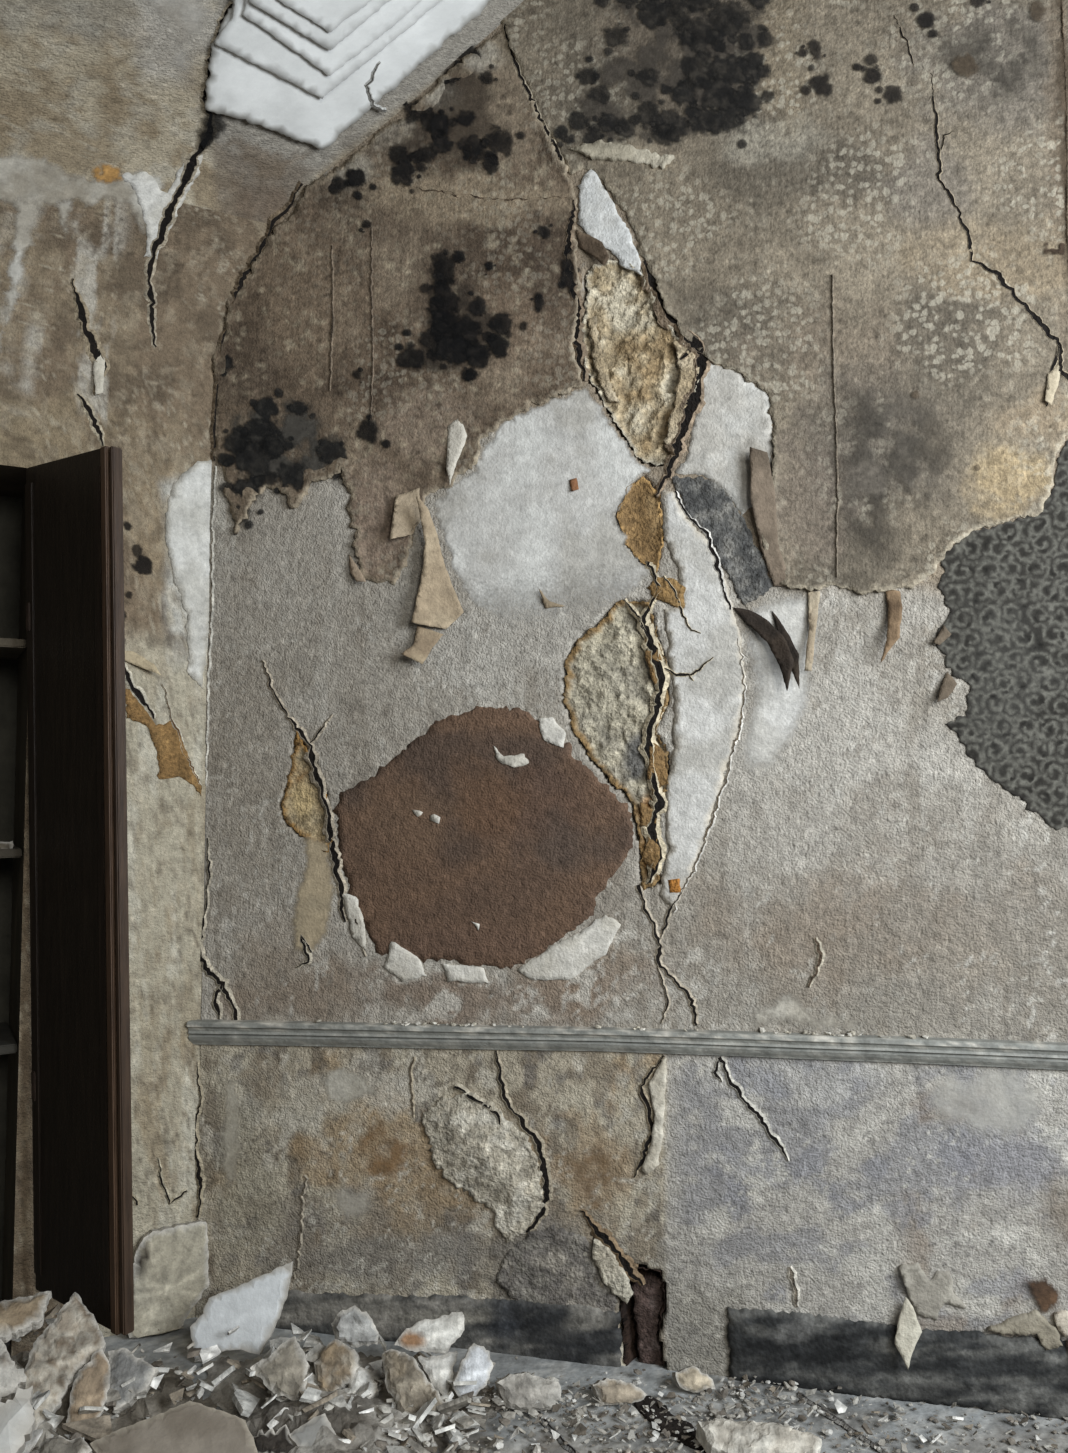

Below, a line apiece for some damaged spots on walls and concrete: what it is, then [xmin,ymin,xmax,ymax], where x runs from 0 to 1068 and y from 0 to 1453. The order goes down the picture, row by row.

mould [551,0,774,148]
crack [143,1,233,348]
mould [395,249,544,384]
mould [558,248,580,292]
crack [893,0,1068,406]
mould [218,388,390,529]
flaking render [281,139,816,983]
peeling [125,651,162,676]
crack [623,260,747,1178]
crack [454,1050,646,1286]
spalling [496,1224,666,1366]
spalling [635,1395,706,1453]